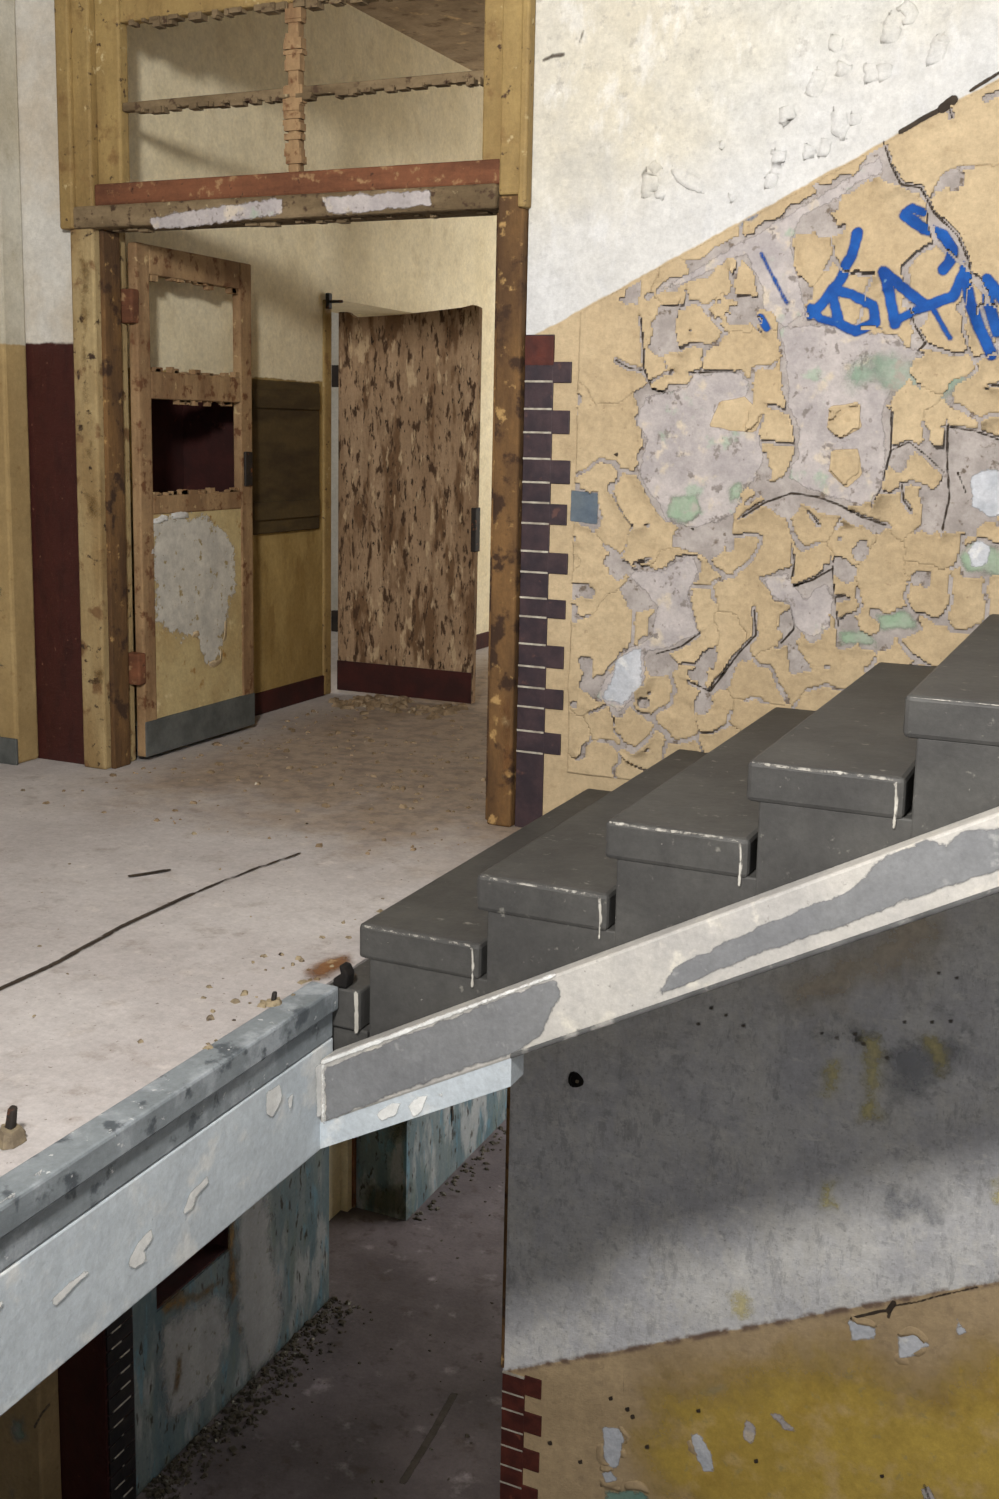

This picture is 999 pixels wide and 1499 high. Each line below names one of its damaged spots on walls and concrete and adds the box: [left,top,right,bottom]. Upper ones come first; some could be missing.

peeling [152,512,237,668]
damp [394,1122,406,1139]
damp [366,1186,407,1218]
peeling [160,1194,282,1416]
peeling [848,1314,877,1340]
peeling [894,1326,929,1365]
peeling [578,1357,999,1499]